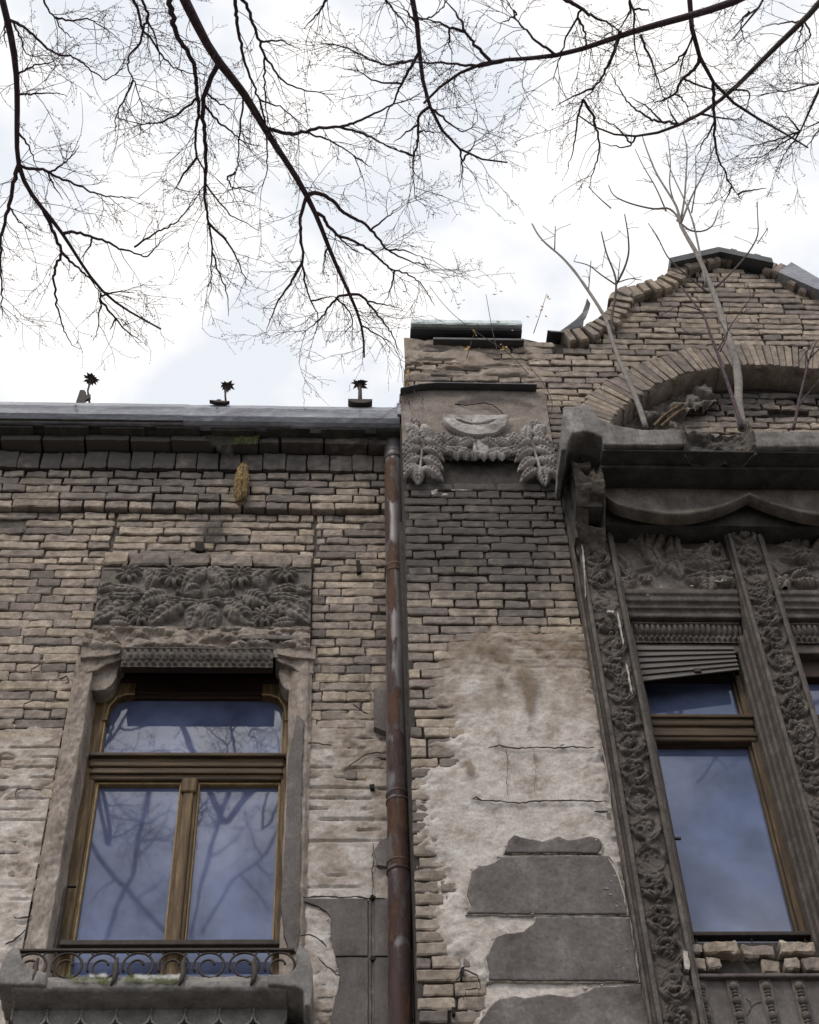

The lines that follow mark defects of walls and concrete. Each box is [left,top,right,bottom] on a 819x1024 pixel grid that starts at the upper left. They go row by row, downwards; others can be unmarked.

peeling [607,610,624,646]
damp [516,668,538,730]
corrosion [385,455,412,1024]
crack [472,744,608,813]
flaking render [297,667,388,1024]
crack [304,842,387,899]
flaking render [414,624,648,1024]
crack [300,934,341,976]